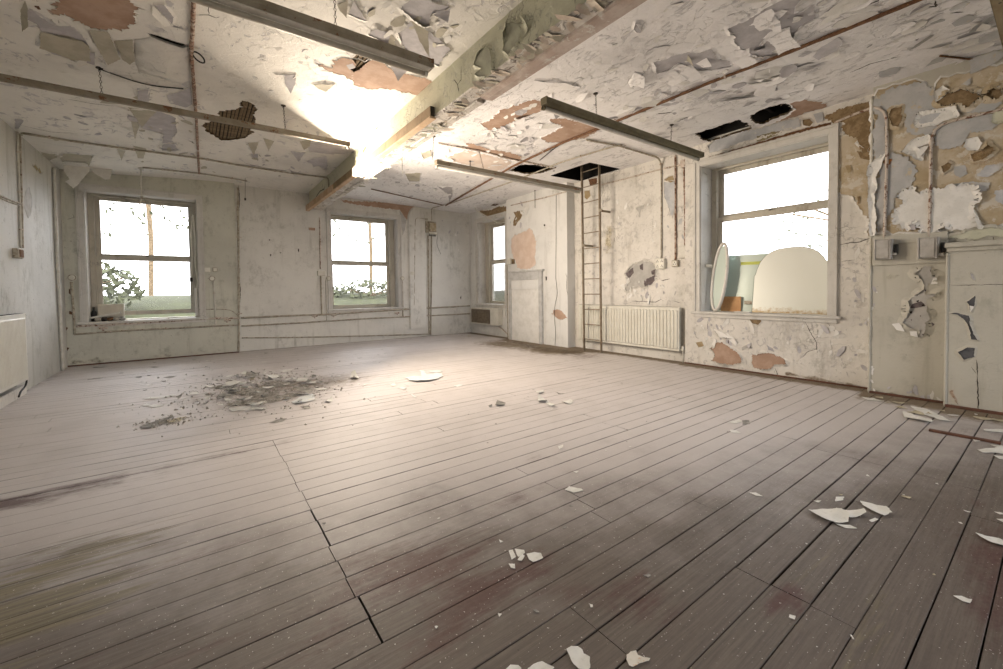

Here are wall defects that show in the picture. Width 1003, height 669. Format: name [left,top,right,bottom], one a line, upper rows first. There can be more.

peeling [39,140,100,171]
peeling [245,138,274,170]
peeling [272,72,303,102]
peeling [310,0,1003,246]
flaking render [466,183,537,270]
peeling [620,258,676,304]
flaking render [694,277,878,391]
peeling [892,263,981,362]